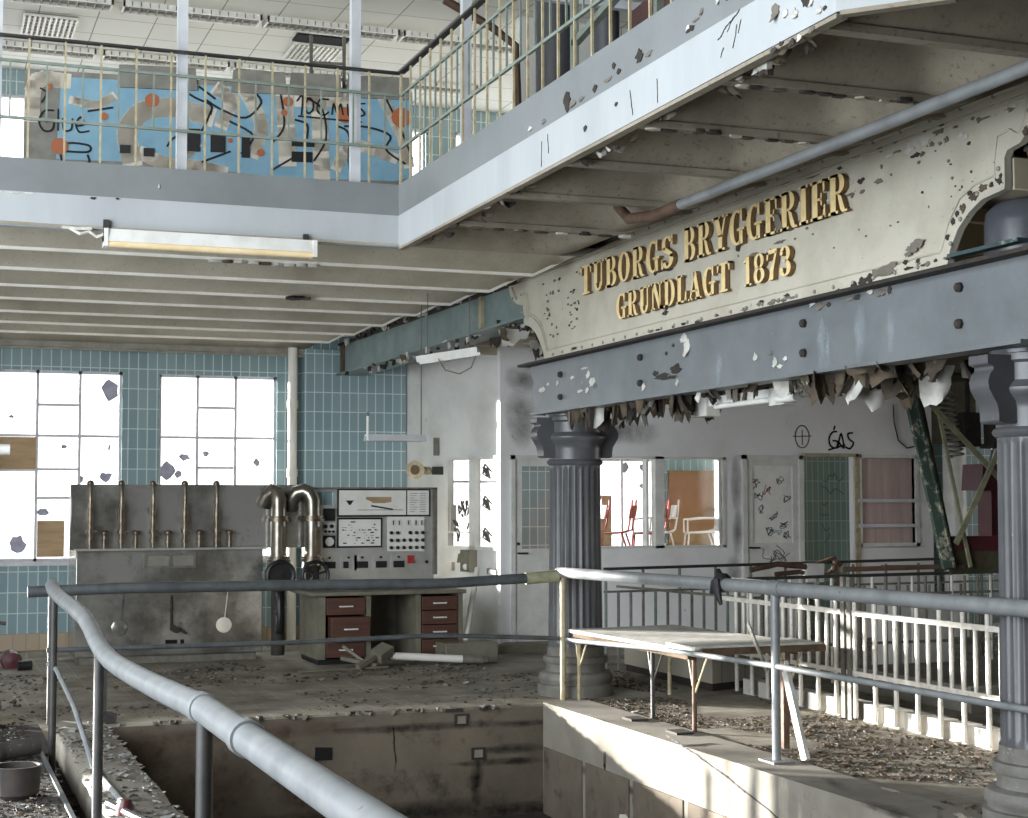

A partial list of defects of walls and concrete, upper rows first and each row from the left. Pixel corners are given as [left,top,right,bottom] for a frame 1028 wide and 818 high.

peeling [563,62,621,113]
peeling [635,48,653,64]
spalling [719,0,827,99]
spalling [581,112,678,167]
peeling [837,124,971,208]
spalling [419,184,632,242]
peeling [945,159,1002,241]
peeling [837,239,952,302]
peeling [344,298,467,346]
spalling [364,277,579,375]
peeling [539,367,597,393]
peeling [565,300,974,436]